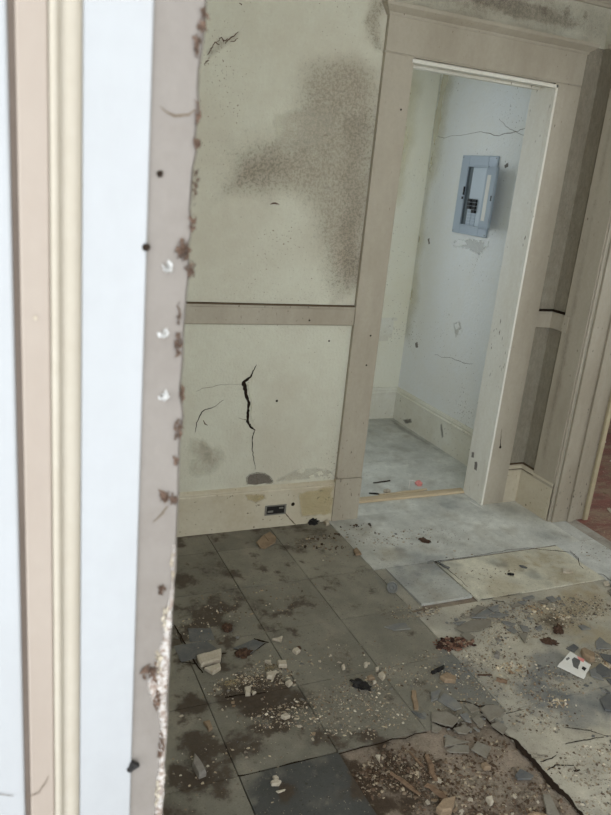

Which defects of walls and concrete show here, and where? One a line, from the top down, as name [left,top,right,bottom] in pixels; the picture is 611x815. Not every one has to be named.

crack [438,119,525,138]
peeling [188,169,200,232]
crack [195,366,258,469]
peeling [140,650,164,711]